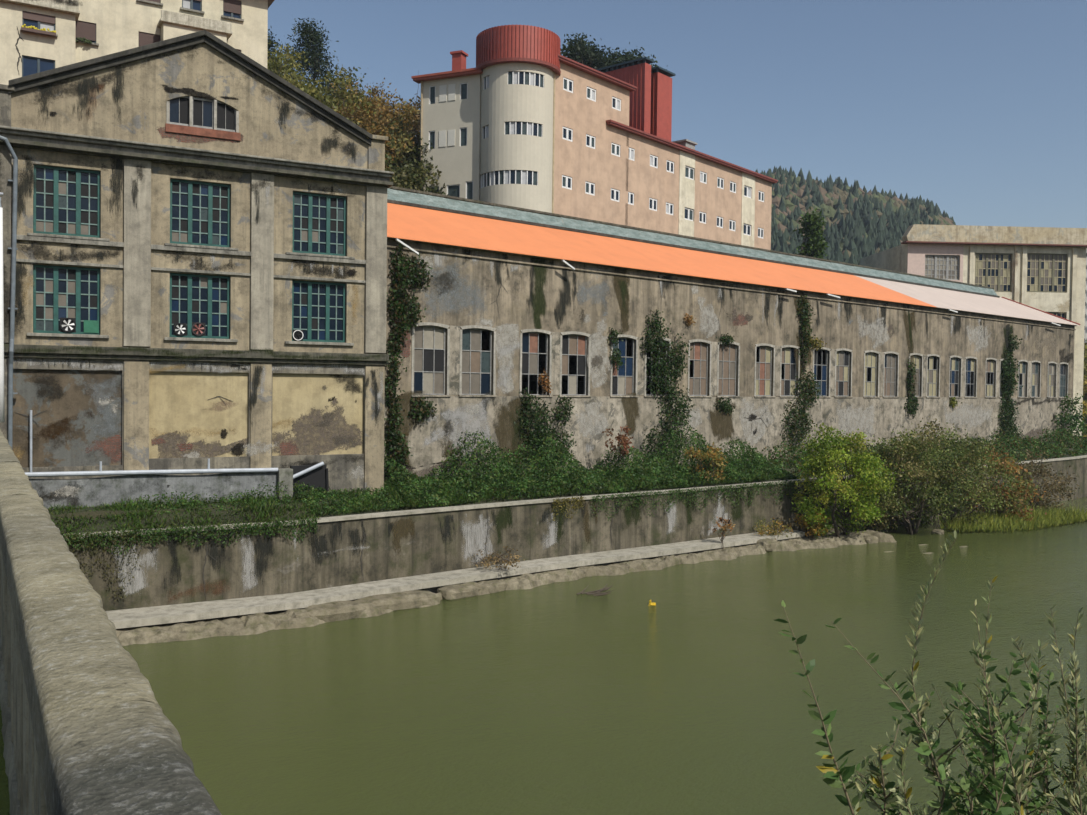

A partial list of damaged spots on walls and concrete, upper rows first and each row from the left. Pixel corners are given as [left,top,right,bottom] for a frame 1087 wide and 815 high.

damp [33,45,196,121]
damp [434,249,477,267]
damp [554,265,576,327]
damp [41,417,69,447]
spalling [151,429,248,458]
spalling [272,397,363,456]
damp [114,534,181,594]
damp [196,527,274,588]
damp [294,522,370,566]
damp [438,506,513,563]
damp [541,504,566,547]
damp [667,487,753,534]